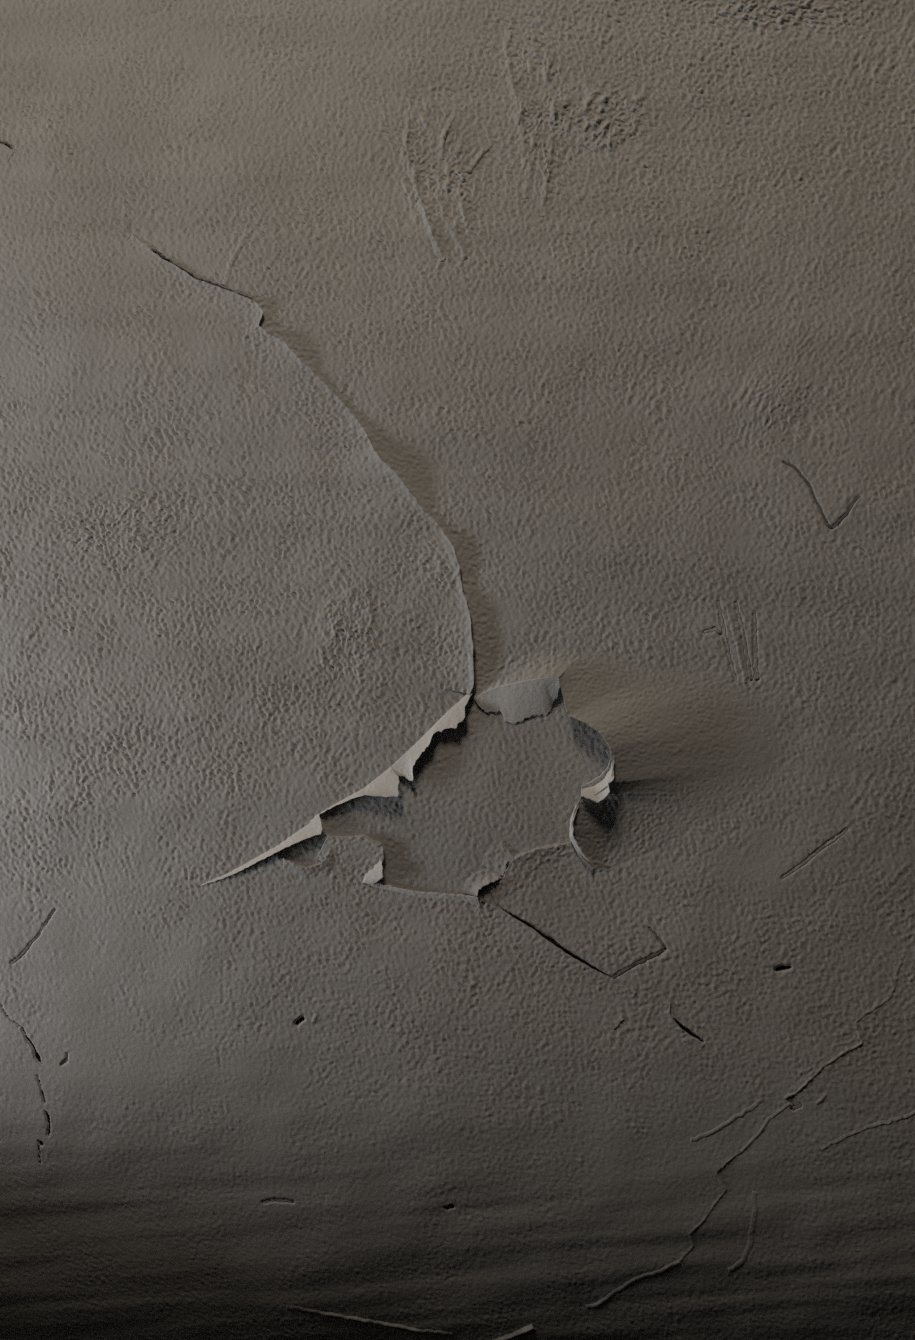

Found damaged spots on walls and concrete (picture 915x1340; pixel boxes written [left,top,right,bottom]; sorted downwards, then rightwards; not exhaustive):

peeling [201,650,793,911]
crack [11,909,56,964]
crack [475,900,705,1051]
crack [14,1021,50,1163]
crack [586,953,915,1309]
crack [494,1324,536,1340]